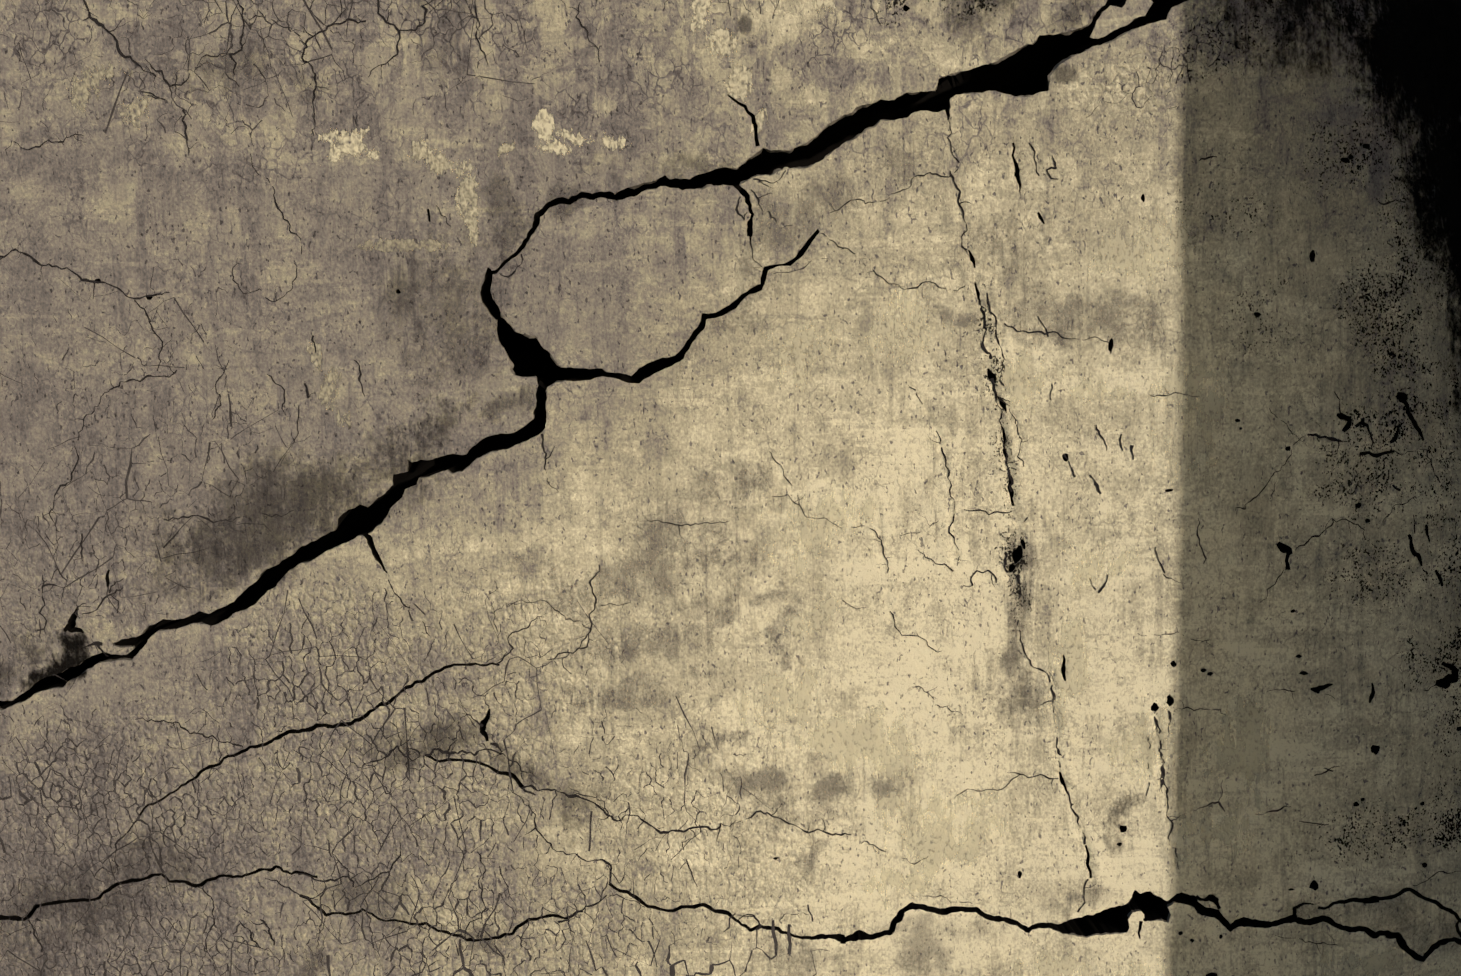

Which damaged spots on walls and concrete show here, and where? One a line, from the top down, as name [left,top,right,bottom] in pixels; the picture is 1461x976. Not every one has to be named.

crack [1085,16,1235,118]
crack [829,169,958,213]
crack [862,258,965,291]
crack [0,245,310,645]
crack [1235,408,1347,511]
leakage [1159,0,1461,870]
crack [770,452,1012,587]
crack [1155,518,1207,583]
crack [842,600,941,652]
crack [574,702,619,785]
crack [627,696,706,795]
crack [951,772,1058,814]